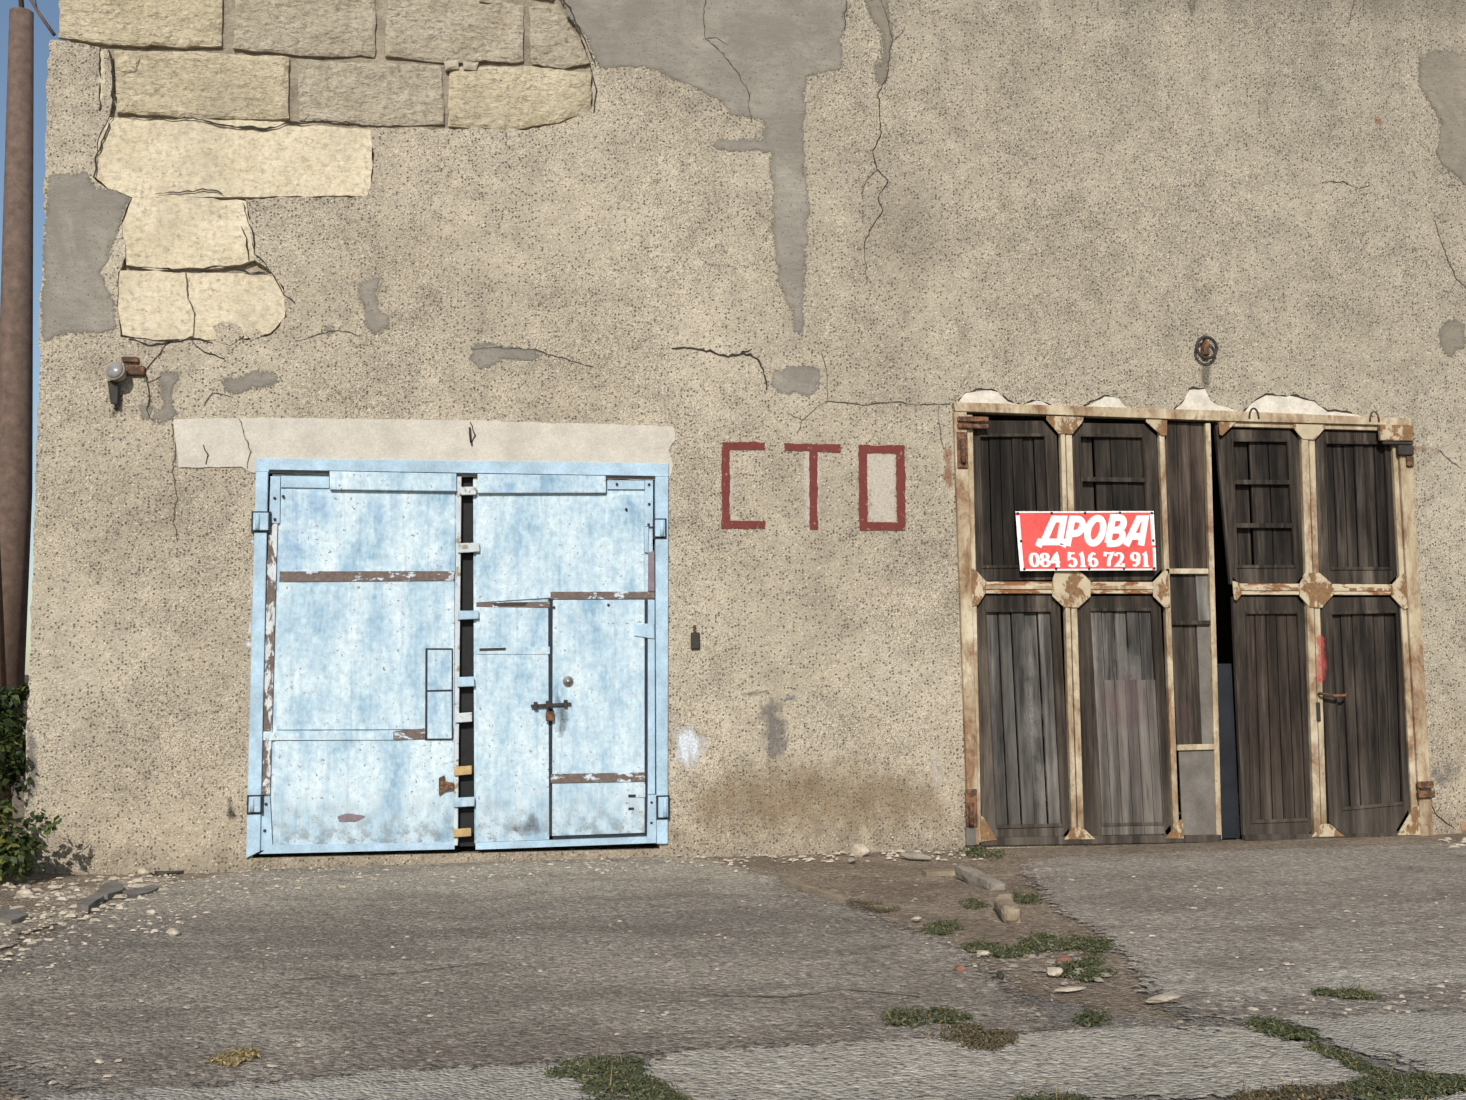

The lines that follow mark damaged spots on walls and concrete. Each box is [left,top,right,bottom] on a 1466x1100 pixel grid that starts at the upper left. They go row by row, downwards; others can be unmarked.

spalling [58,0,592,346]
crack [844,0,905,278]
crack [671,347,1111,449]